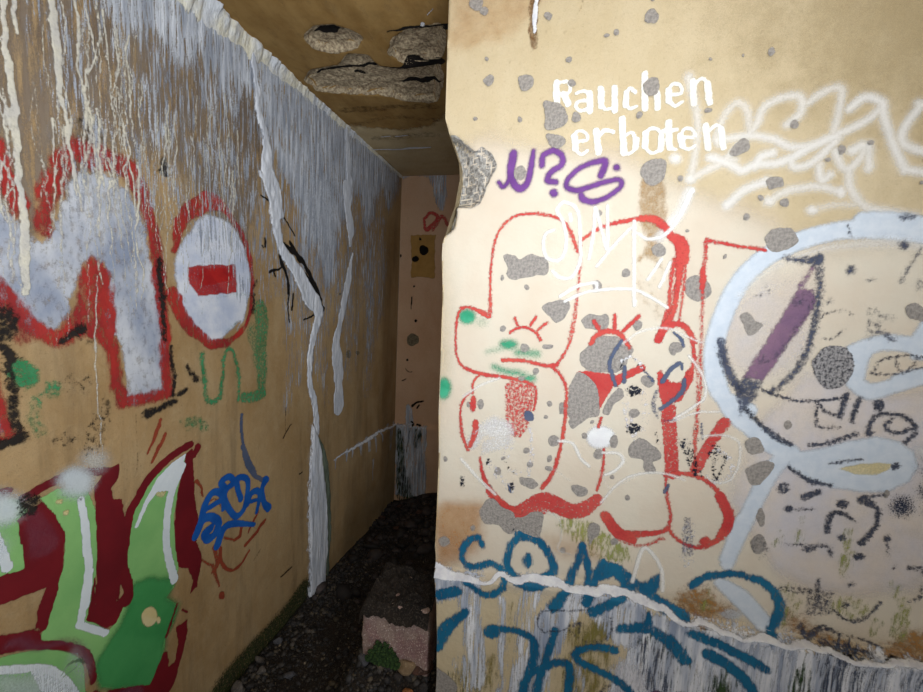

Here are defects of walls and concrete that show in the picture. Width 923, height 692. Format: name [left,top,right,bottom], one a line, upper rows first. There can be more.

spalling [304,10,448,103]
spalling [447,135,497,235]
water stain [0,0,449,577]
crack [262,217,325,323]
peeling [400,235,436,306]
water stain [434,562,923,692]